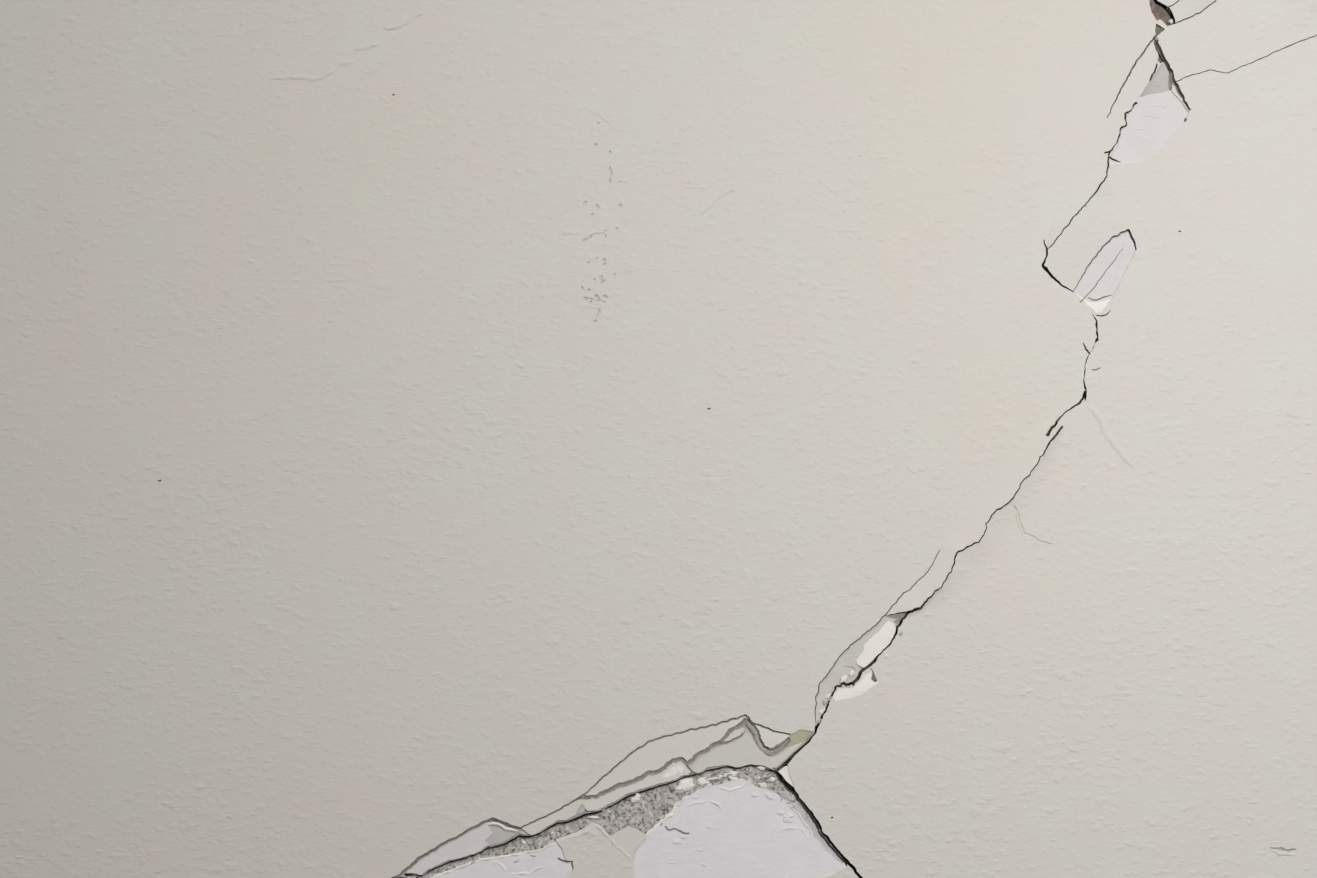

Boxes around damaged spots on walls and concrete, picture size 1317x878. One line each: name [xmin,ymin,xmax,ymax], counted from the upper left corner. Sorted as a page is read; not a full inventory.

peeling [1109,90,1189,165]
peeling [1073,229,1137,313]
crack [392,0,1317,878]
peeling [430,778,847,878]